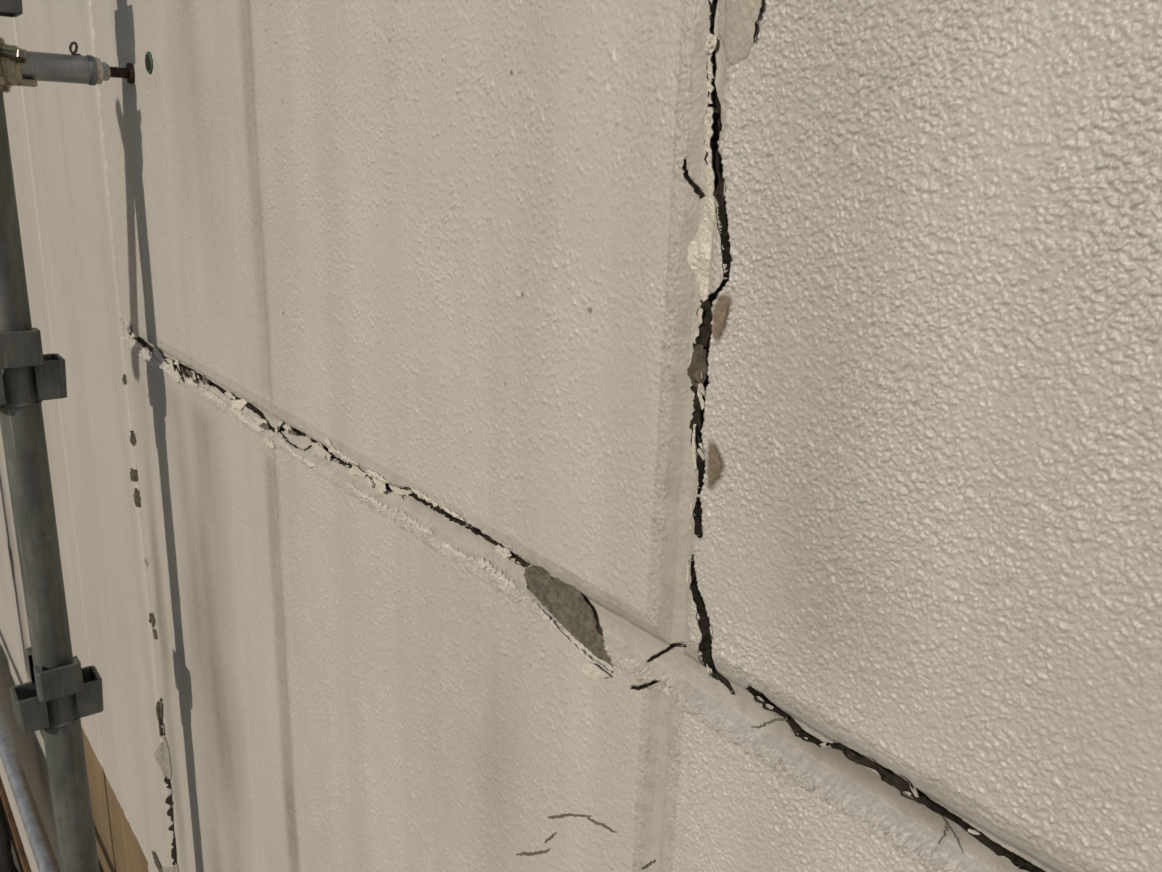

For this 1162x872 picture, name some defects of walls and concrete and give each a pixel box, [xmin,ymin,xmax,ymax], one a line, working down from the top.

crack [129,329,530,567]
peeling [123,320,624,686]
crack [630,0,1046,872]
crack [164,776,177,865]
crack [516,813,617,856]